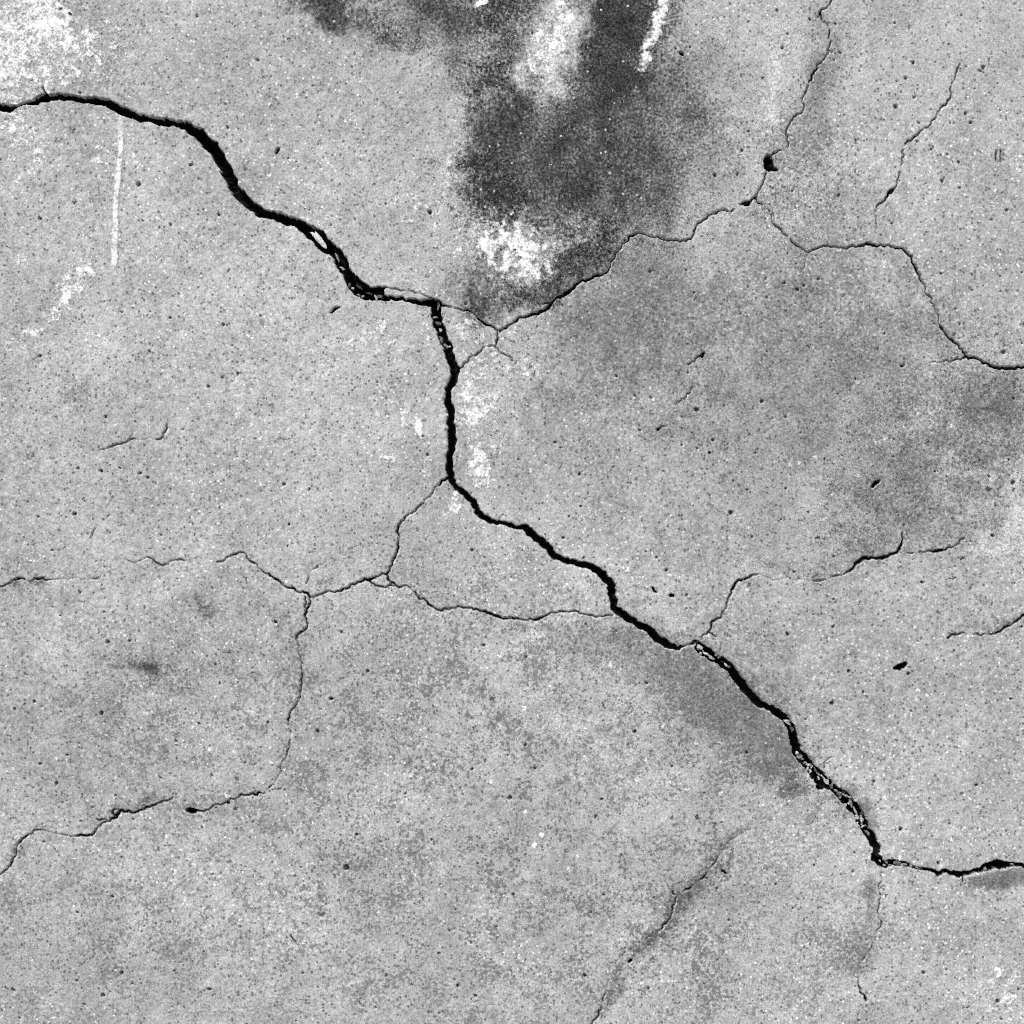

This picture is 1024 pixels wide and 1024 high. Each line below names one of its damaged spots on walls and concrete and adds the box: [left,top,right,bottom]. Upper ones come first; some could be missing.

damp [762,28,790,124]
crack [805,0,832,92]
damp [289,0,726,389]
efflorescence [401,410,423,439]
crack [0,94,1024,884]